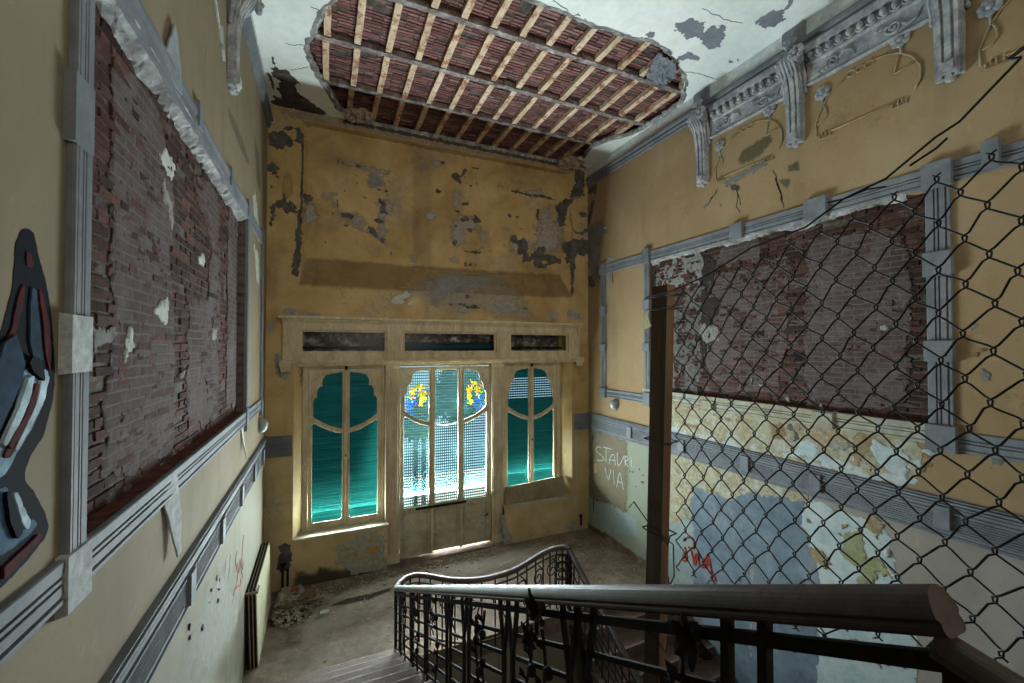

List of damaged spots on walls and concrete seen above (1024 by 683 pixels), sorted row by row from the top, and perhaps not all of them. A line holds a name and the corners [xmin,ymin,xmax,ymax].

peeling [755,0,793,29]
flaking render [267,0,560,167]
peeling [431,160,489,267]
crack [773,171,784,208]
flaking render [87,0,393,557]
flaking render [644,192,937,486]
peeling [334,529,387,575]
peeling [668,454,901,584]
peeling [773,624,918,647]
peeling [773,649,918,683]